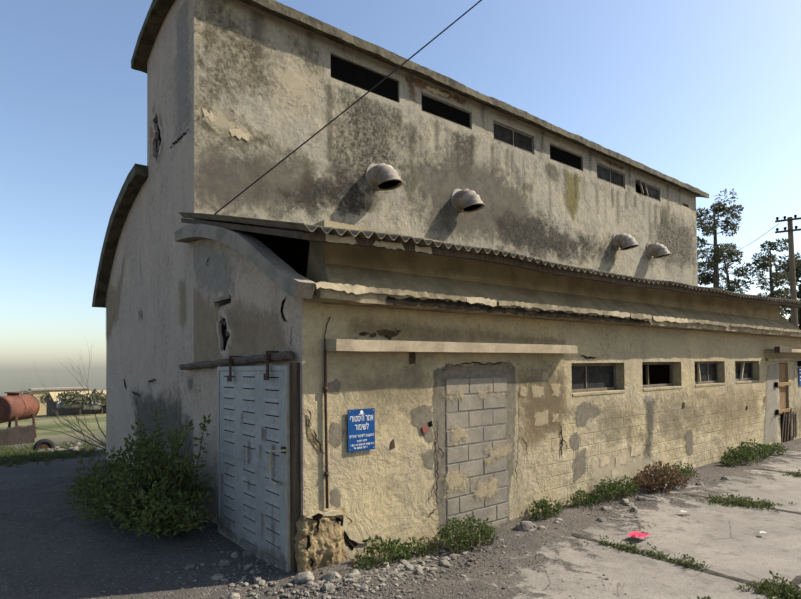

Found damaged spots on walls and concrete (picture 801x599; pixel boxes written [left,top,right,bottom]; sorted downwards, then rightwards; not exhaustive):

flaking render [150,3,191,162]
flaking render [202,109,251,142]
water stain [194,4,610,264]
flaking render [193,244,284,362]
flaking render [315,282,801,333]
spalling [357,329,402,340]
spalling [306,407,324,455]
spalling [418,421,433,436]
crack [559,422,568,460]
flaking render [294,508,358,573]